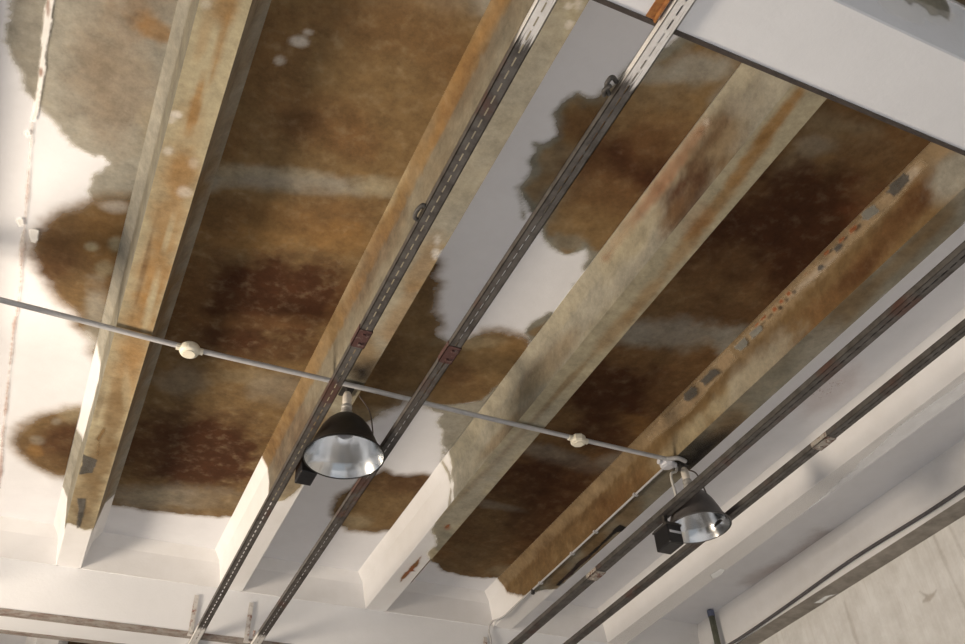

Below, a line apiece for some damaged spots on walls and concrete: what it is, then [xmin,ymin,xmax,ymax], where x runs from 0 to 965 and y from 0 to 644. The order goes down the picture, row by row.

crack [17,190,38,264]
crack [25,0,53,136]
leakage [6,0,199,529]
corrosion [66,0,252,530]
leakage [93,0,589,533]
leakage [411,37,965,596]
leakage [906,0,965,19]